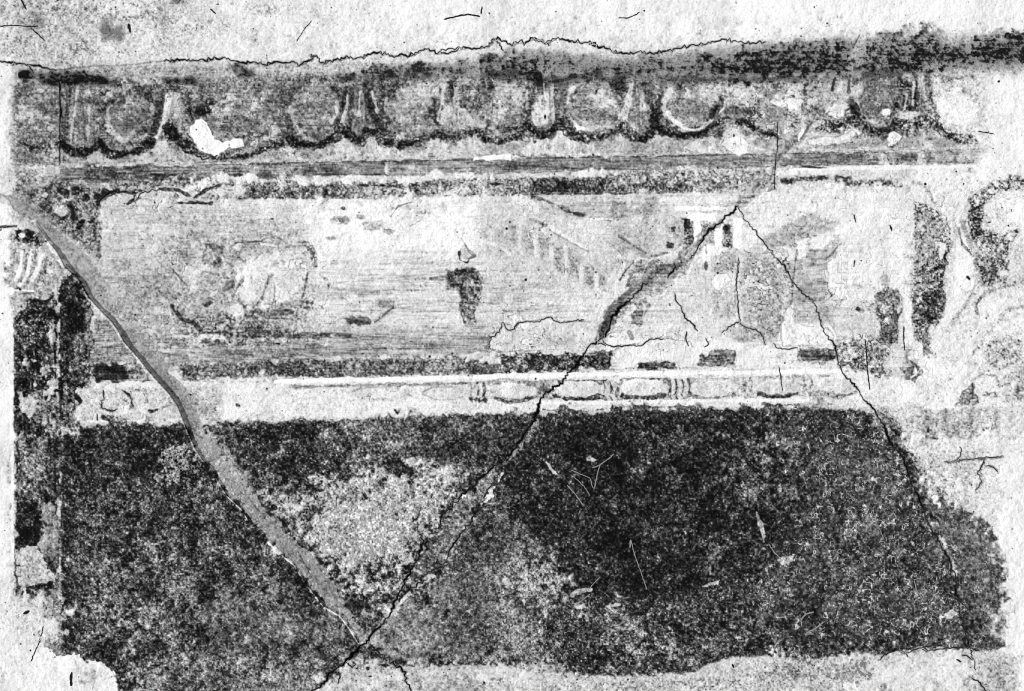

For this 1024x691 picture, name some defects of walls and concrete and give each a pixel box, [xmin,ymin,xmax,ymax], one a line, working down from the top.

spalling [189,119,244,156]
crack [97,188,160,206]
crack [193,185,216,198]
crack [100,390,133,412]
crack [311,205,987,691]
crack [945,446,1004,490]